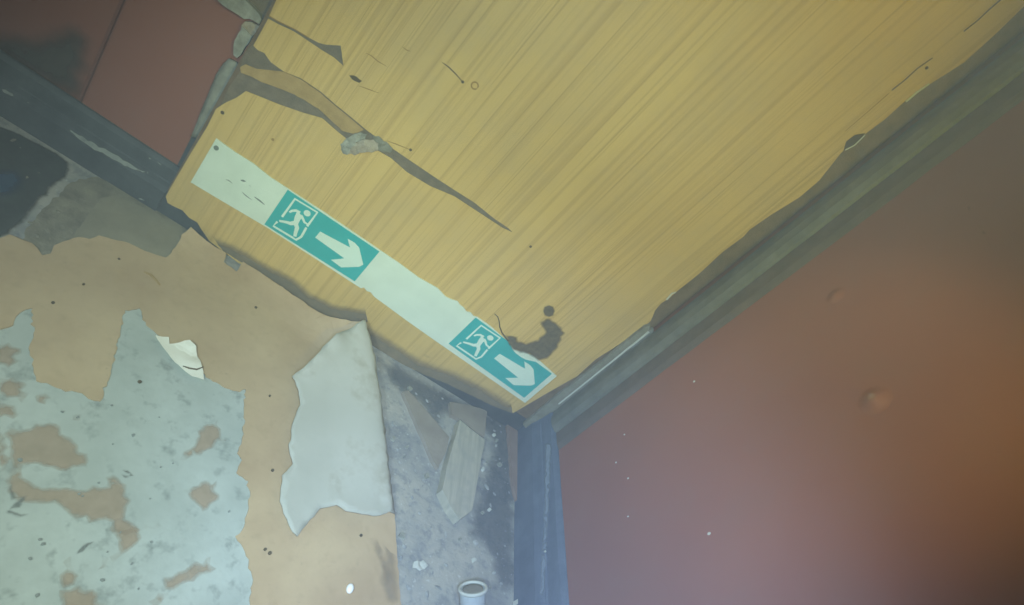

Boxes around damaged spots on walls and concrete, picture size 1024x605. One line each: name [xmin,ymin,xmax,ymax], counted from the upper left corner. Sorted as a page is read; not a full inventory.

spalling [241,44,284,72]
peeling [70,130,148,173]
peeling [0,309,253,605]